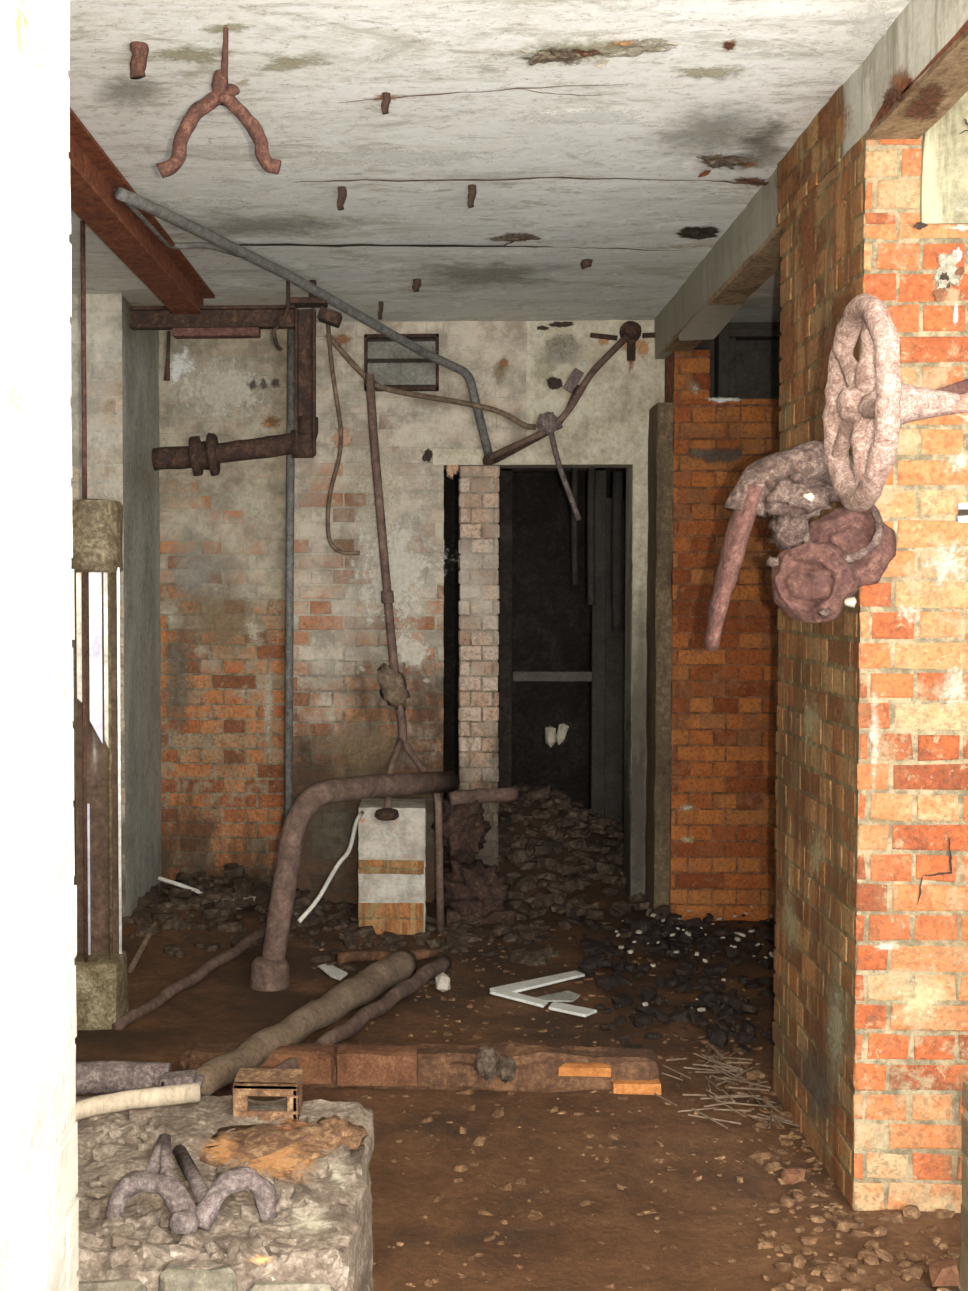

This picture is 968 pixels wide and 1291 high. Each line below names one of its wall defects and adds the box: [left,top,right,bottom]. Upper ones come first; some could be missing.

spalling [518,39,678,69]
damp [680,68,742,78]
rust [870,20,968,129]
damp [675,116,780,160]